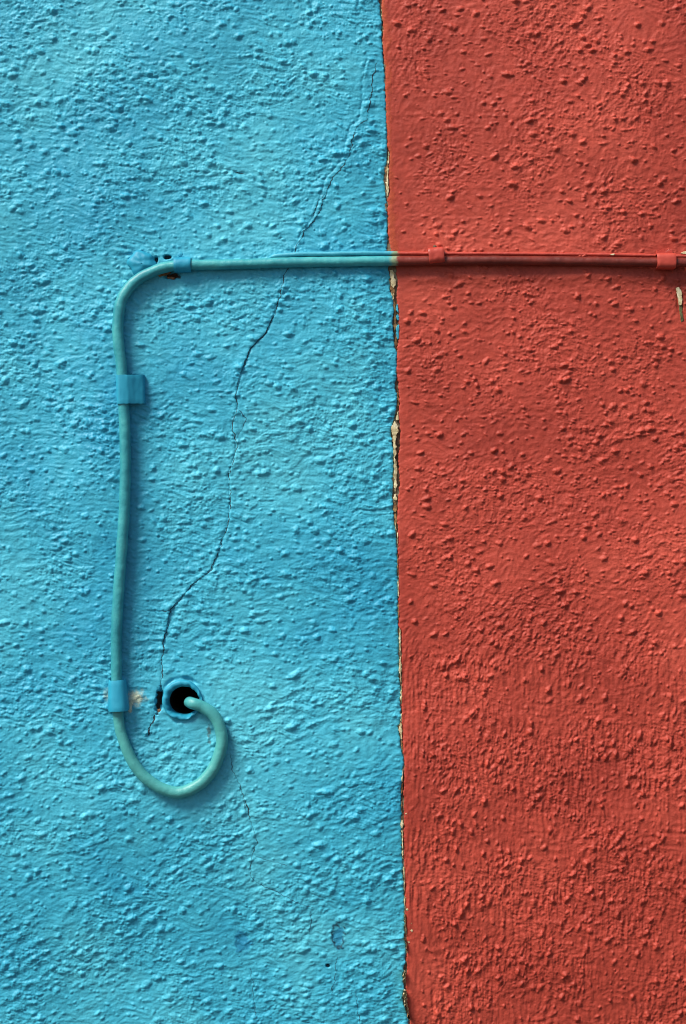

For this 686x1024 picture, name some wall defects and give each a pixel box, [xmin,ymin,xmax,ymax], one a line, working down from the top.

crack [159,64,376,687]
peeling [390,270,399,350]
peeling [391,392,402,701]
crack [230,757,312,934]